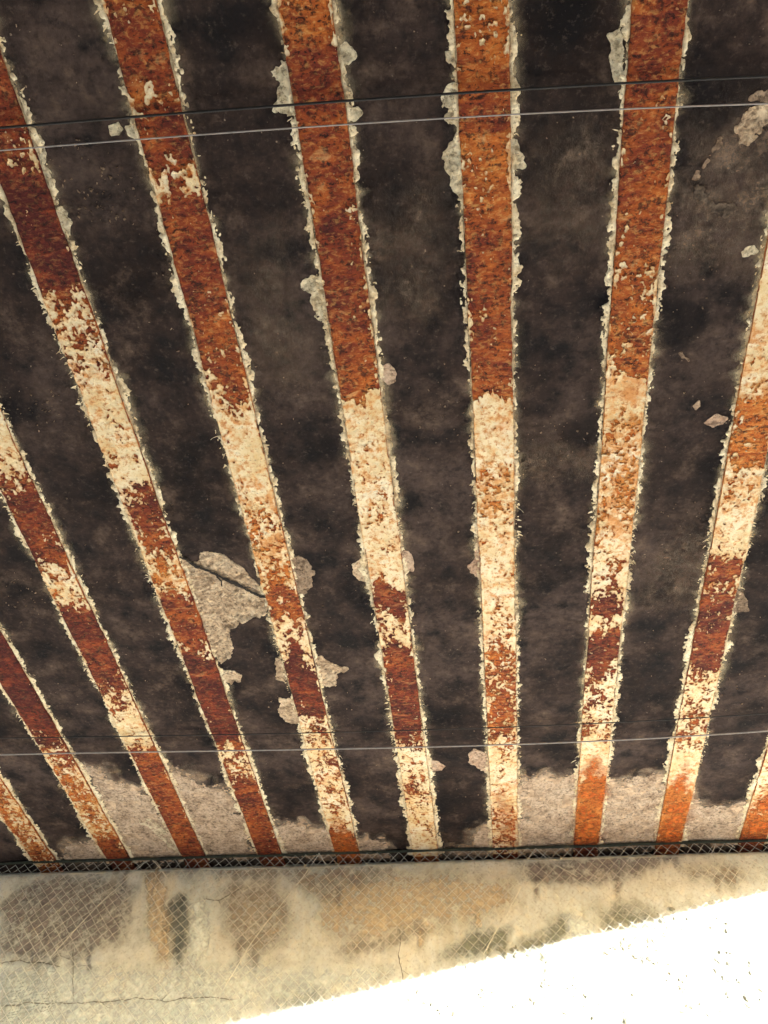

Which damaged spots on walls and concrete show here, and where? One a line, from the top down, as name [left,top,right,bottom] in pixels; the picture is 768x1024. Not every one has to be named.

peeling [0,0,391,868]
peeling [269,0,768,858]
crack [179,557,266,598]
rust [576,759,606,842]
rust [661,765,688,838]
damp [527,857,676,895]
damp [691,867,737,884]
damp [0,867,375,1024]
damp [447,918,587,958]
damp [605,905,659,945]